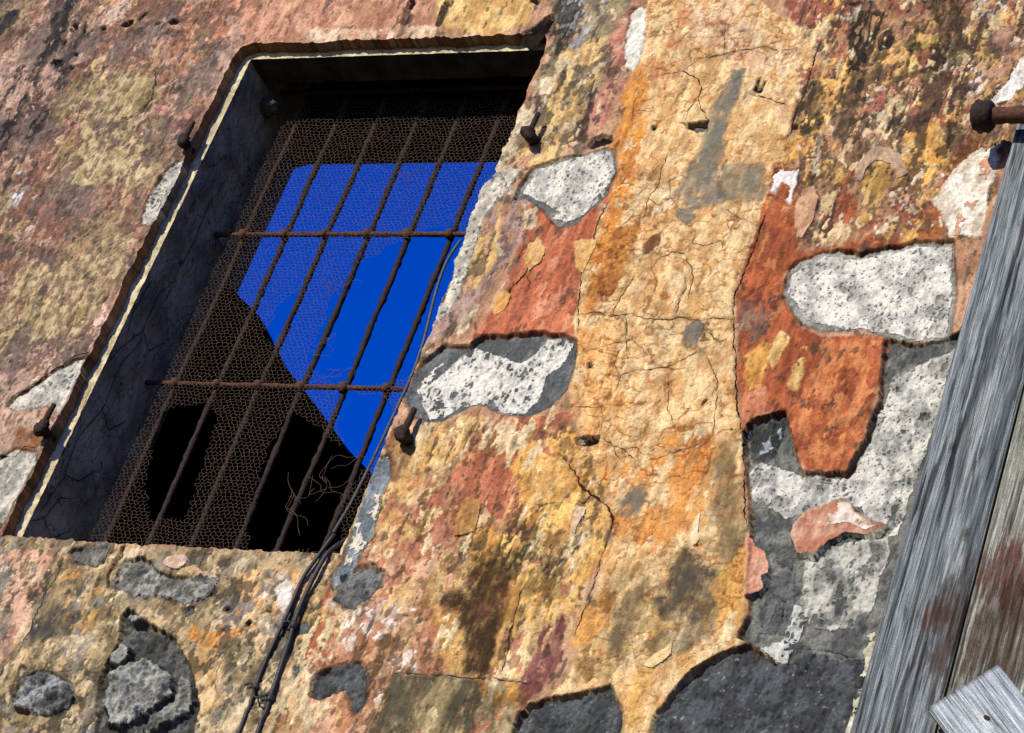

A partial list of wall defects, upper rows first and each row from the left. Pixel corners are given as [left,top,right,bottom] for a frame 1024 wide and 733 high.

crack [666,26,819,139]
spalling [435,138,617,323]
spalling [0,450,36,523]
spalling [10,360,84,413]
spalling [333,458,391,609]
rust [391,430,415,481]
spalling [406,336,577,422]
crack [558,453,614,636]
crack [573,157,765,523]
spalling [653,143,1000,733]
spalling [99,614,200,733]
water stain [441,519,579,733]